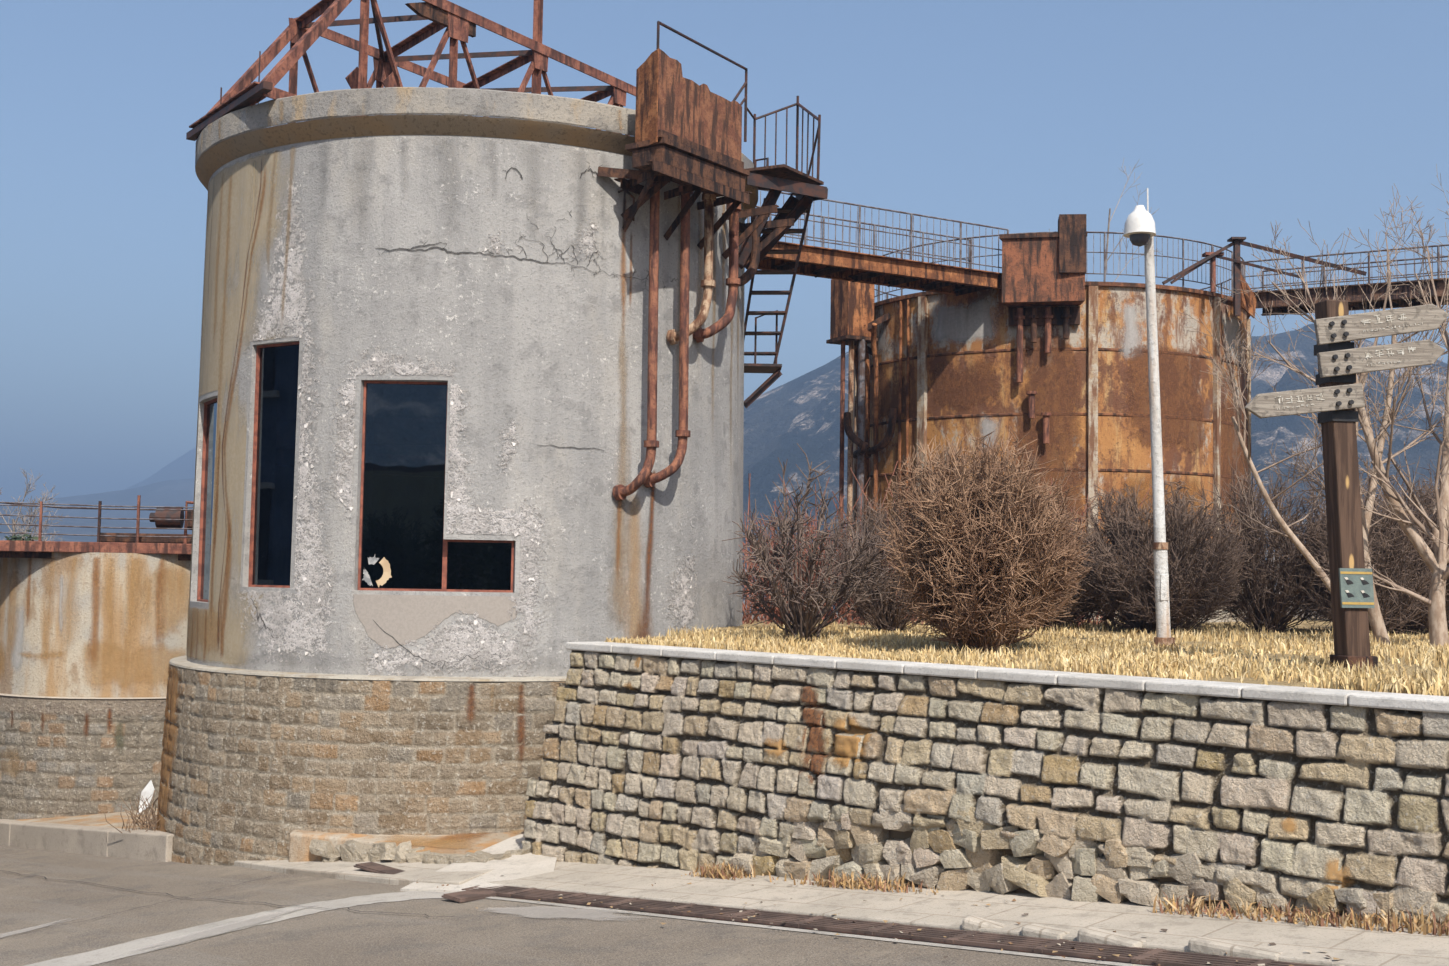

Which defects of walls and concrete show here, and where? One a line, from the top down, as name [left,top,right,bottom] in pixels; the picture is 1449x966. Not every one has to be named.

crack [376,162,678,290]
corrosion [186,152,278,664]
peeling [238,171,548,676]
corrosion [1015,336,1084,516]
corrosion [1127,345,1249,515]
corrosion [156,668,180,832]